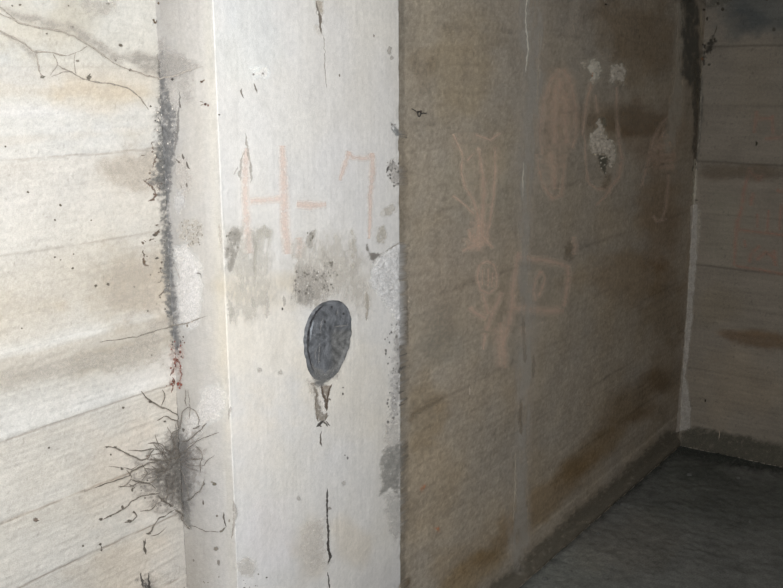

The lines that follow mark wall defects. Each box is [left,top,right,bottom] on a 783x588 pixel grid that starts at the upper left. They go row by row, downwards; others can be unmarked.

crack [316,1,327,88]
damp [132,41,203,351]
damp [491,0,783,588]
corrosion [166,336,185,393]
crack [140,573,152,588]
crack [306,489,332,588]